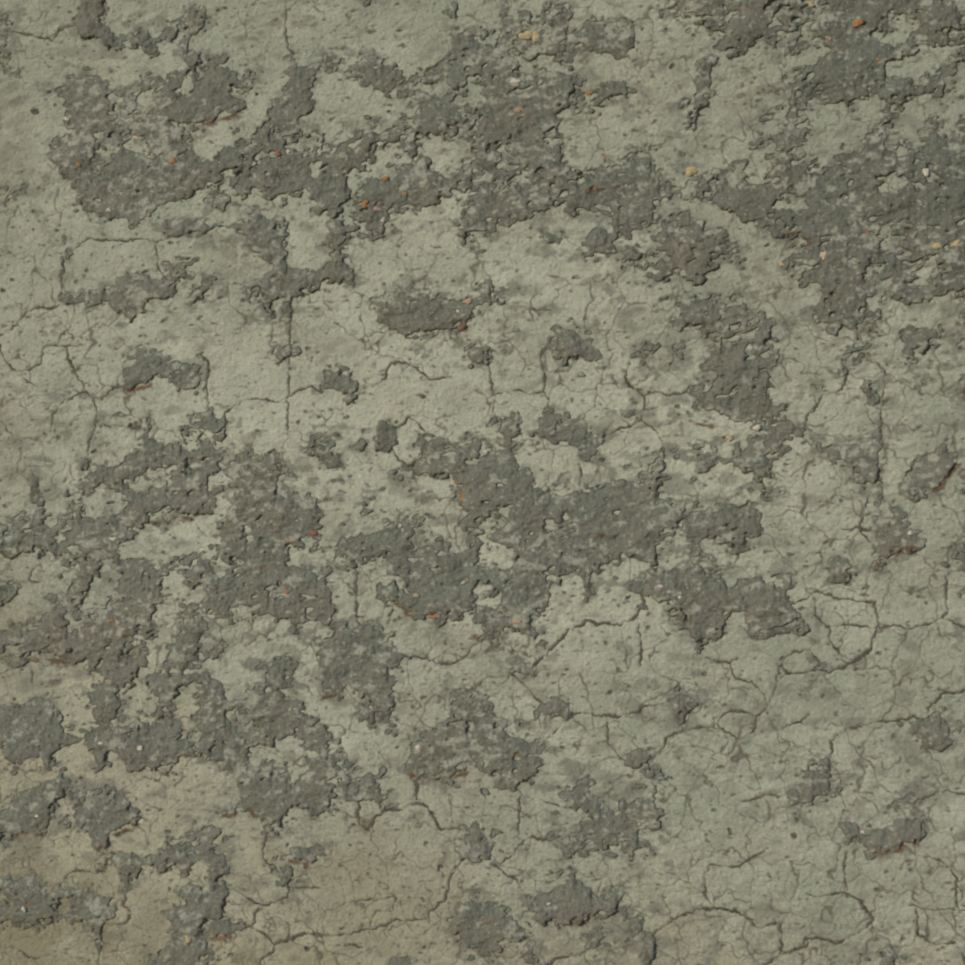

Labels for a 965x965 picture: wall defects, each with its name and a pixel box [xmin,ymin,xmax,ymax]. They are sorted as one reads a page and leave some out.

spalling [47,0,965,377]
crack [0,236,172,458]
crack [199,304,321,456]
spalling [0,293,887,852]
spalling [871,507,927,571]
spalling [899,439,959,503]
crack [471,594,671,761]
crack [651,566,965,804]
spalling [270,844,328,890]
crack [228,862,461,965]
spalling [444,748,672,965]
crack [653,851,875,965]